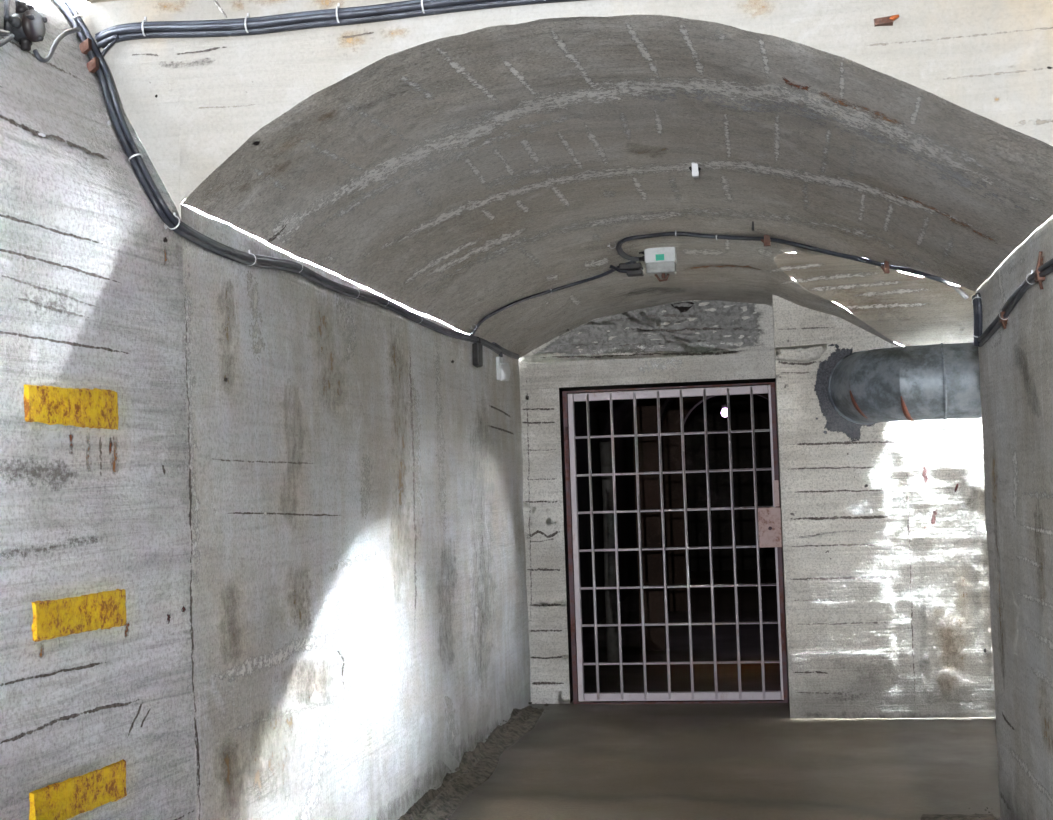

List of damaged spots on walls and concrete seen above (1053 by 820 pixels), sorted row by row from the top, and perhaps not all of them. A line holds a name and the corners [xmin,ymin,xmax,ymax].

crack [0,331,128,354]
rust [86,437,117,475]
crack [233,510,342,518]
crack [174,265,310,820]
crack [1,662,107,686]
crack [230,651,345,731]
crack [0,699,151,744]